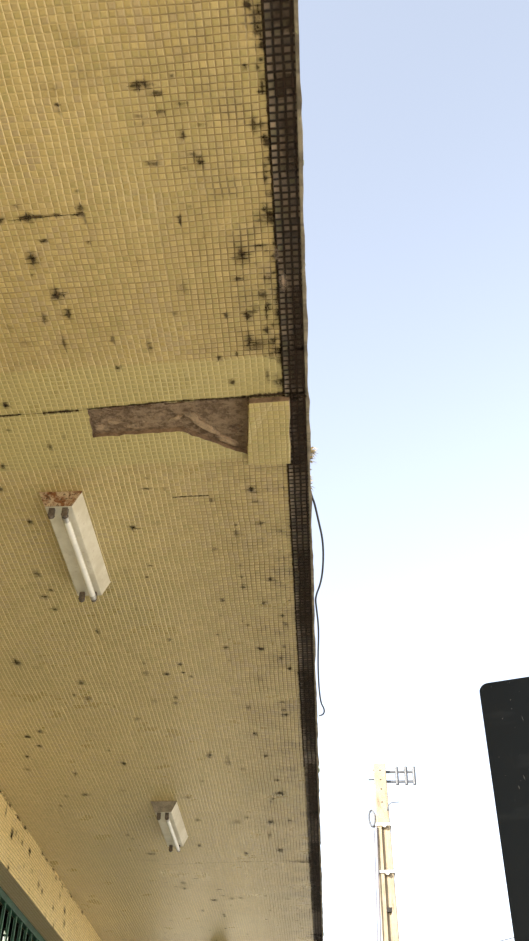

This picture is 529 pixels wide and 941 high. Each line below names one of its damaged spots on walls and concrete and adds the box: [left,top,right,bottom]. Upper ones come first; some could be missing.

crack [0,392,307,417]
spalling [88,398,249,450]
water stain [230,0,322,941]